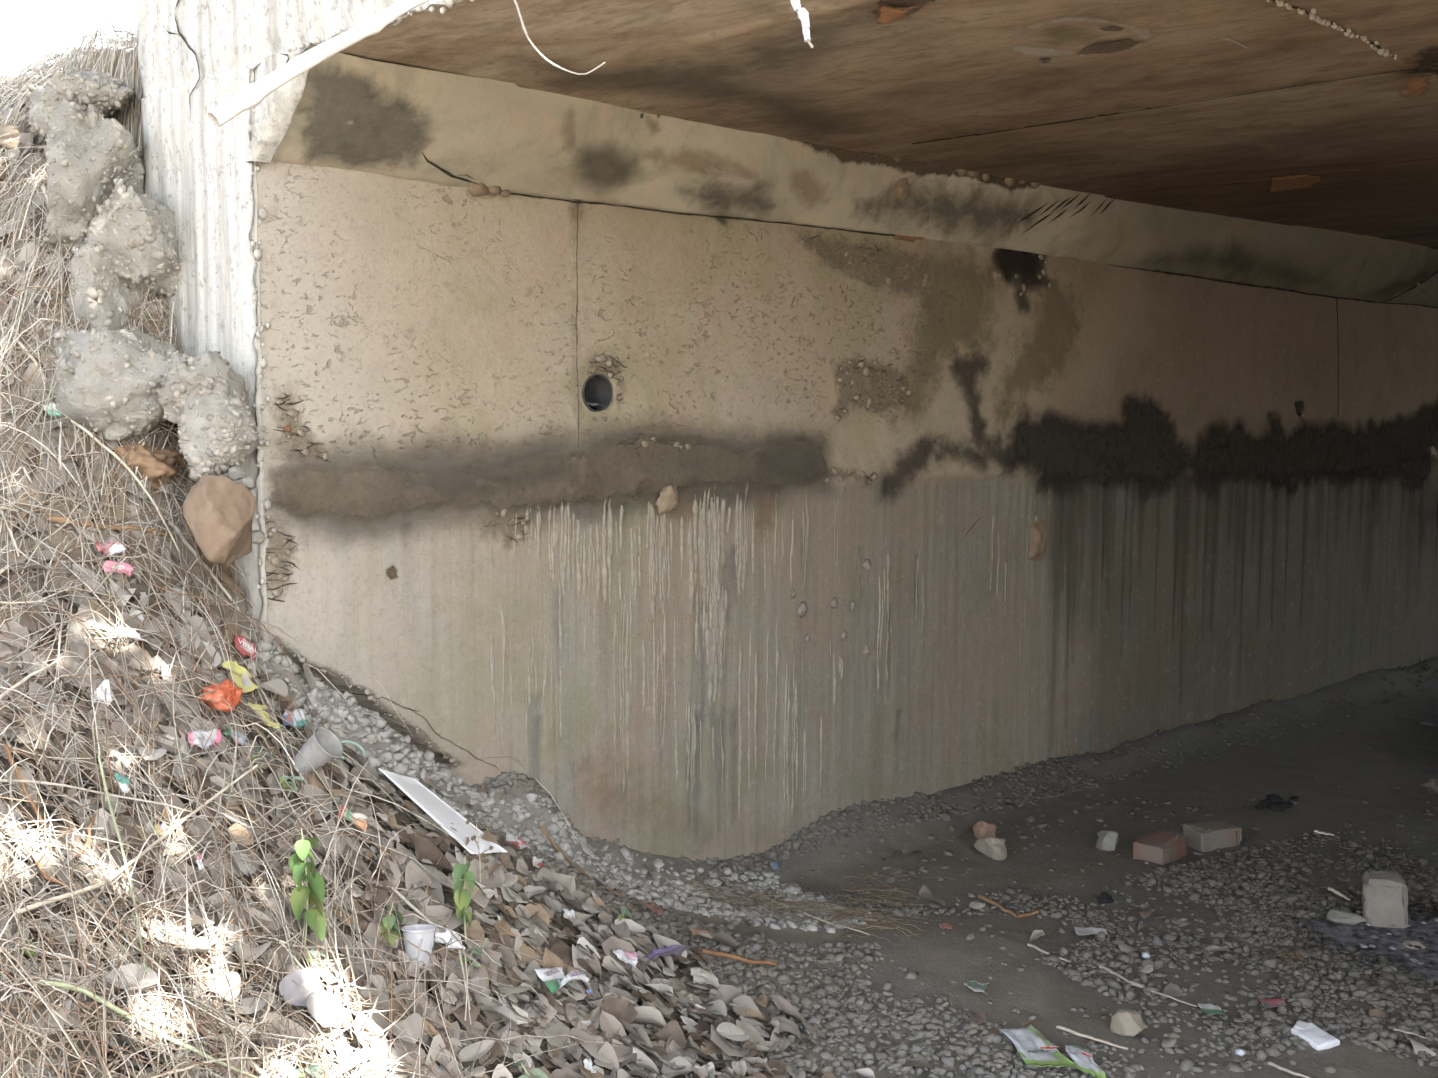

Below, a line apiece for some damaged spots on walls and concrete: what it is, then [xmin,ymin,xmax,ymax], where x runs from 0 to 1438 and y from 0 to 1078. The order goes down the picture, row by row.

damp [301,70,426,166]
damp [582,151,631,185]
damp [689,185,771,210]
damp [881,357,1438,571]
damp [493,483,823,823]
damp [830,640,843,704]